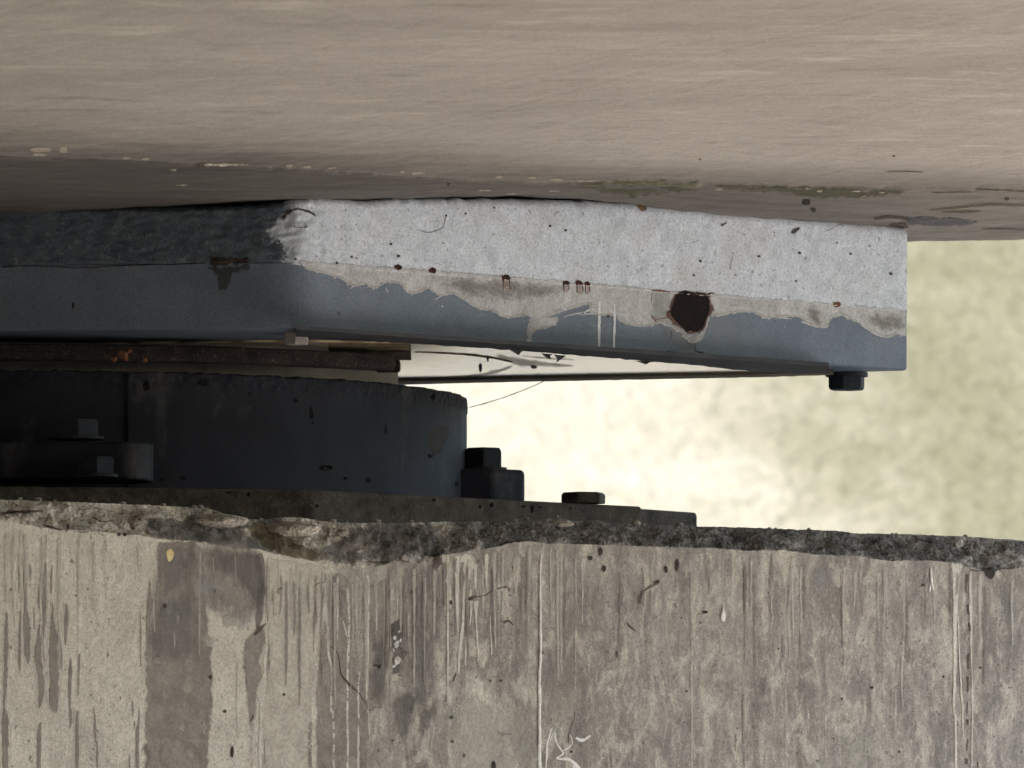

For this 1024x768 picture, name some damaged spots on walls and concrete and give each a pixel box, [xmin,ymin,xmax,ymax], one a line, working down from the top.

corrosion [562,280,590,293]
spalling [313,523,456,571]
damp [129,521,320,768]